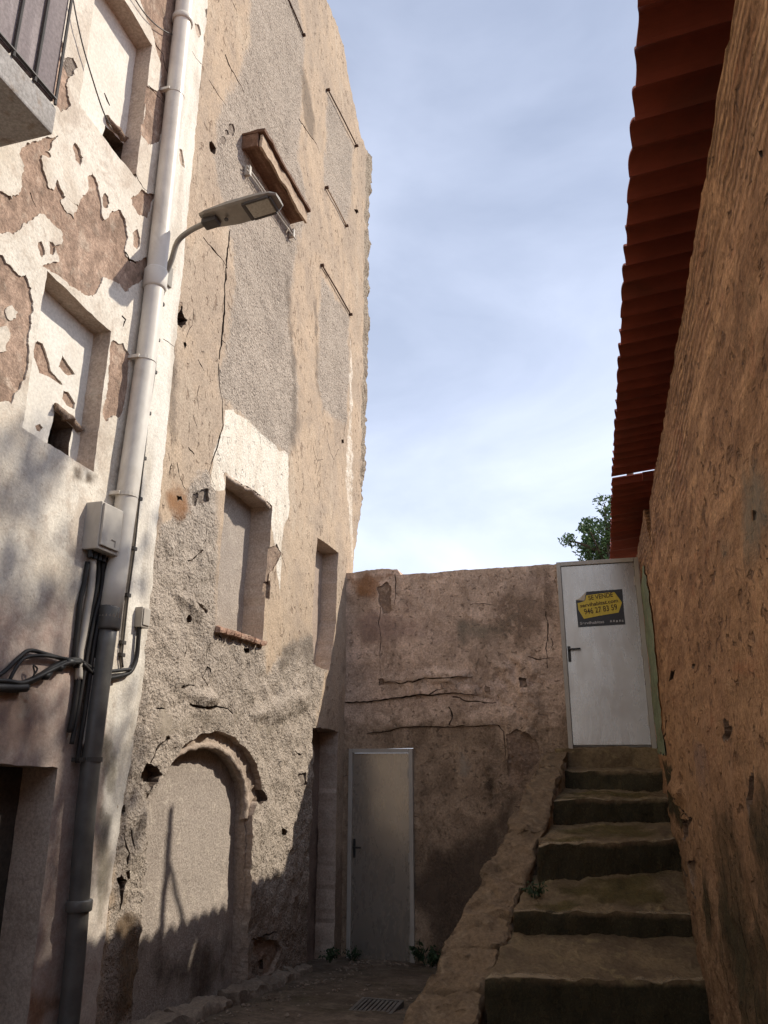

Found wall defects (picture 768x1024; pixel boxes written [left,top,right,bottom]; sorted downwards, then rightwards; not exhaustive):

flaking render [0,137,147,296]
flaking render [131,190,154,218]
flaking render [0,255,84,432]
flaking render [102,341,129,421]
crack [163,231,230,488]
spalling [262,544,281,600]
flaking render [377,582,392,613]
crack [182,633,233,714]
crack [346,574,506,756]
spalling [141,763,163,800]